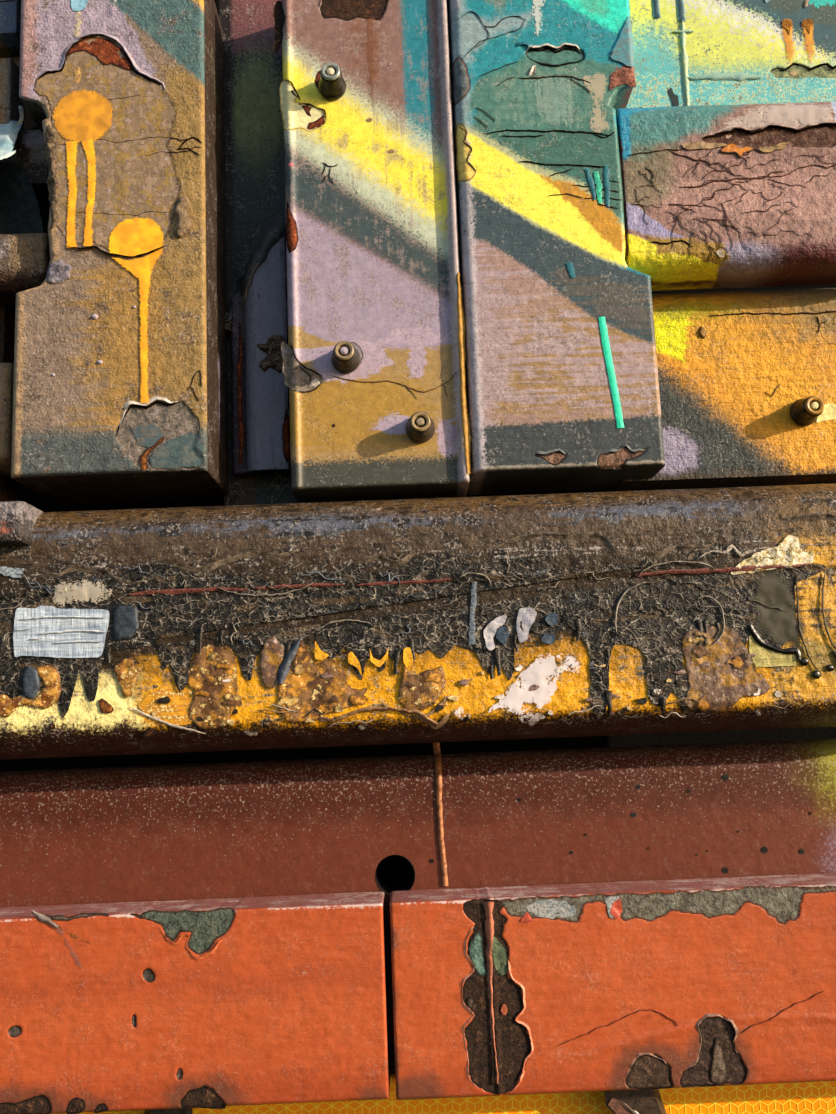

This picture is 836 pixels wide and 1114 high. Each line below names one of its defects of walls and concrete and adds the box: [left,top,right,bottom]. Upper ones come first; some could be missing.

crack [461,11,590,92]
peeling [34,32,203,260]
crack [178,137,202,155]
peeling [682,104,836,158]
crack [475,107,836,268]
peeling [115,396,205,472]
peeling [0,531,826,730]
peeling [130,907,235,961]
crack [559,1009,678,1046]
peeling [461,885,836,1094]
crack [743,991,824,1033]
peeling [181,1086,226,1109]